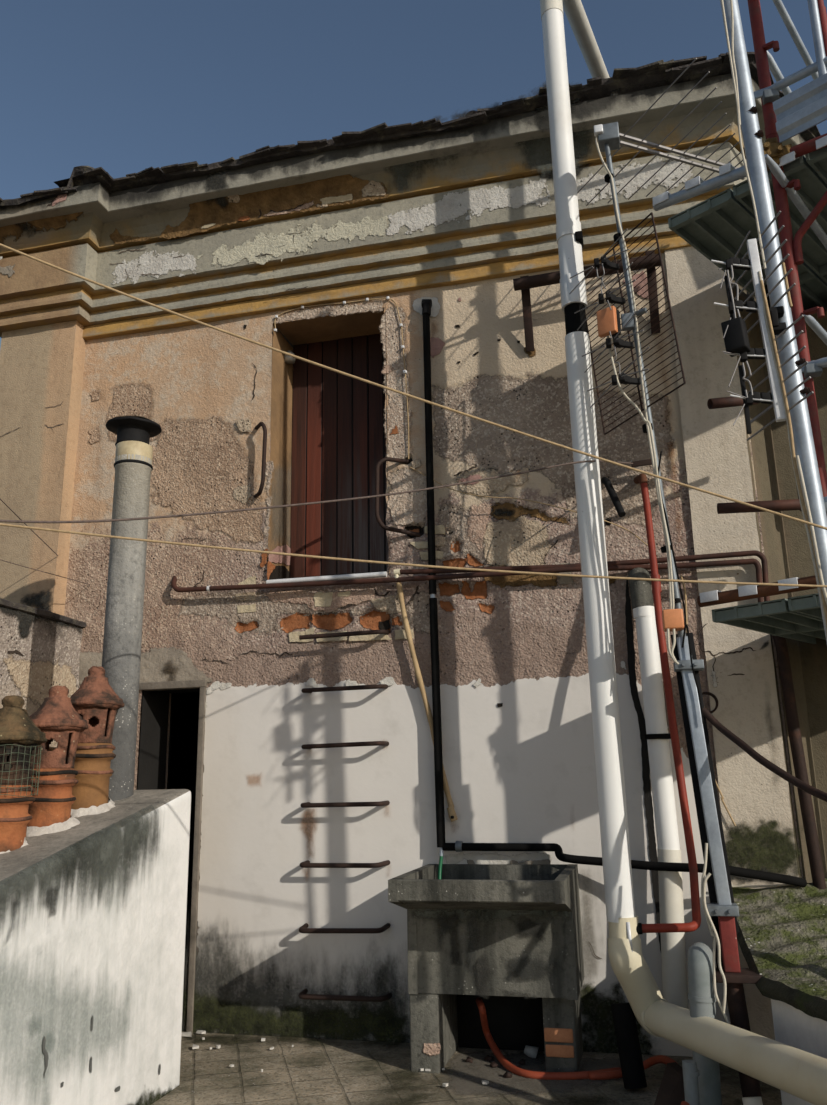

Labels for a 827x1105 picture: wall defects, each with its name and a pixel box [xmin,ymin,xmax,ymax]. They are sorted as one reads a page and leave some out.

peeling [112,178,552,286]
spalling [88,382,291,580]
peeling [179,301,578,636]
spalling [593,390,674,528]
peeling [205,681,232,721]
leakage [0,820,152,922]
rust [303,812,315,841]
leakage [182,931,410,1043]
leakage [412,909,569,998]